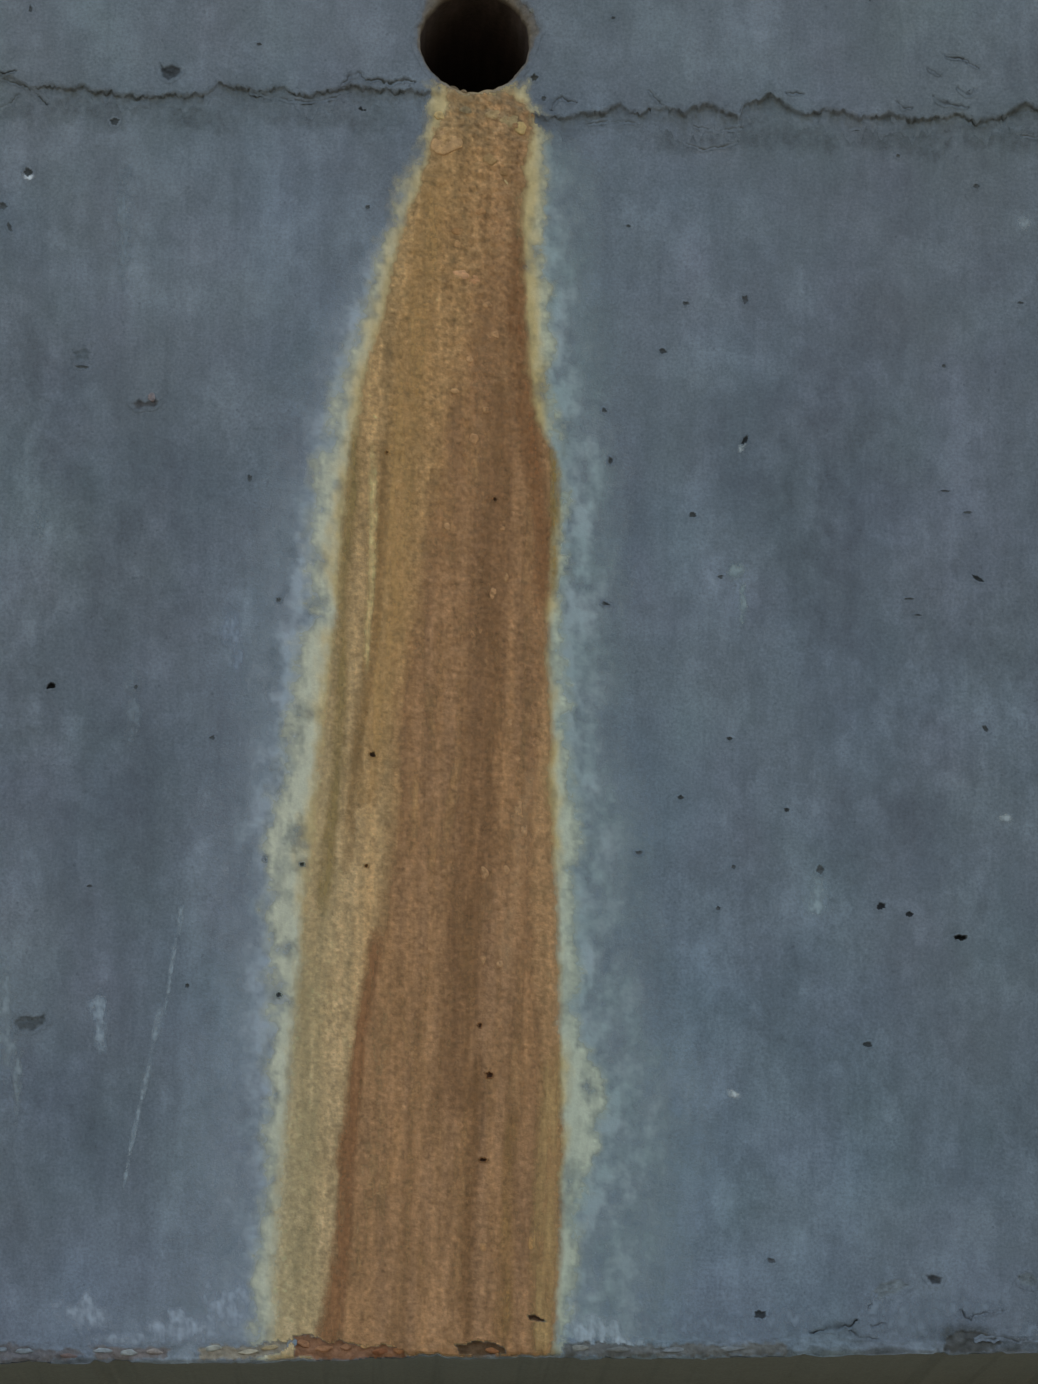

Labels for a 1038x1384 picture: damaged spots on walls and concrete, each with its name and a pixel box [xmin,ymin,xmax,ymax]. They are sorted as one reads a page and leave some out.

crack [0,68,434,122]
crack [533,54,1038,153]
corrosion [250,84,607,1361]
spalling [0,1337,175,1364]
spalling [192,1334,411,1364]
spalling [454,1340,512,1360]
spalling [559,1307,797,1360]
spalling [937,1324,1007,1355]